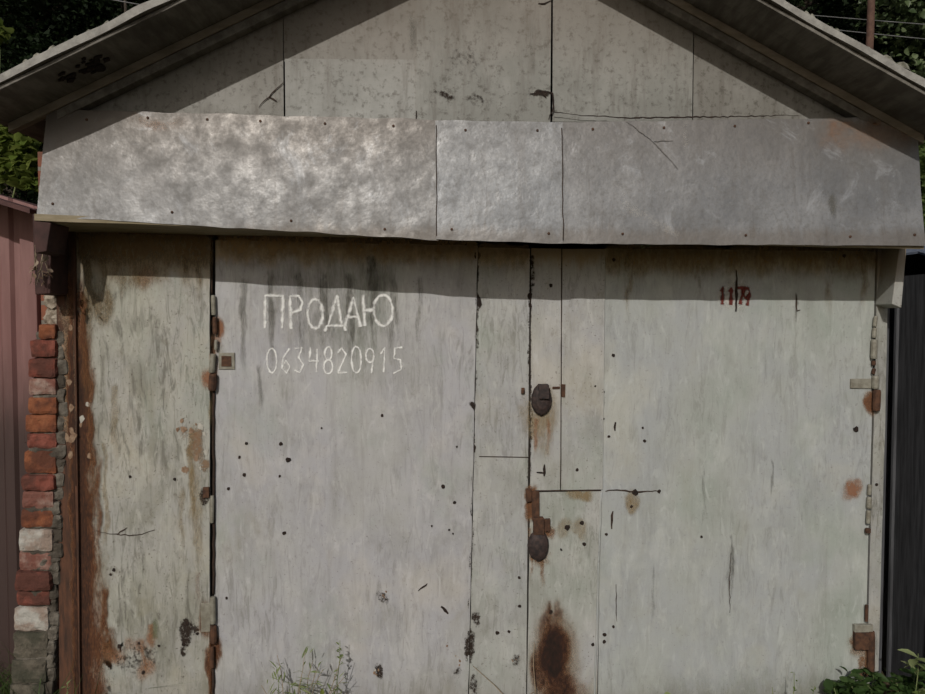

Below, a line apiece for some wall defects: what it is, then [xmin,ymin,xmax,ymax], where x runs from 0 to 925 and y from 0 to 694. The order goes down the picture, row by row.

rust [863,391,876,413]
rust [66,276,157,694]
rust [846,480,861,499]
rust [531,608,579,694]